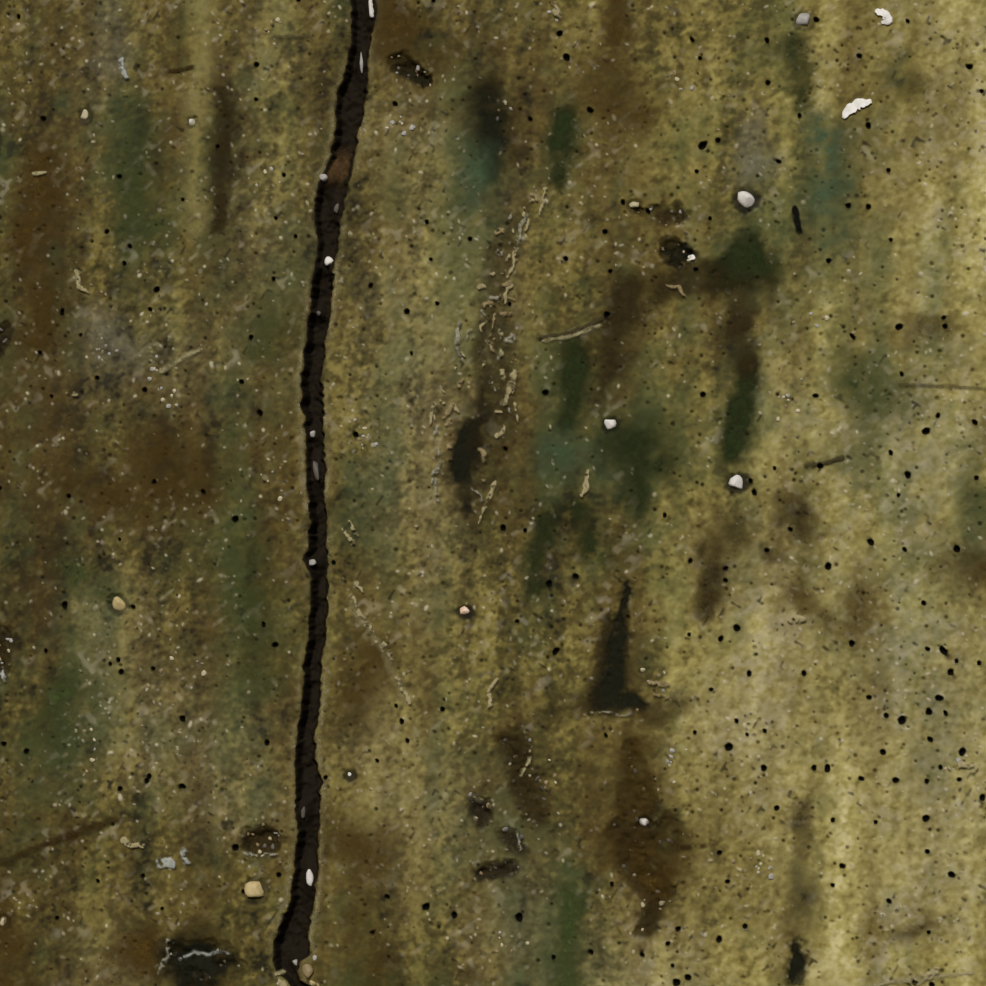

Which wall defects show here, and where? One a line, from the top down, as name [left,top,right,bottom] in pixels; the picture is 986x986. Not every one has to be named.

leakage [476,82,508,180]
crack [272,0,376,986]
leakage [449,389,490,513]
leakage [588,580,647,715]